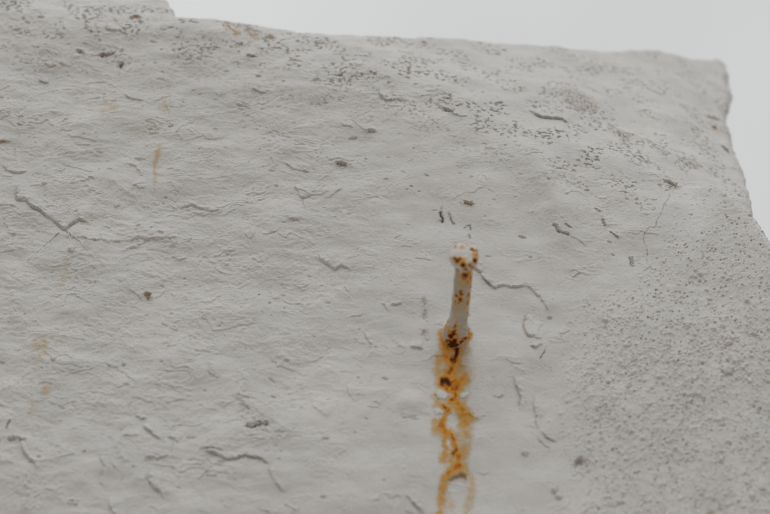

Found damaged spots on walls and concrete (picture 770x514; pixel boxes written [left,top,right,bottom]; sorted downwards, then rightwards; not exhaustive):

crack [436,205,472,240]
crack [473,262,555,313]
corrosion [432,329,478,514]